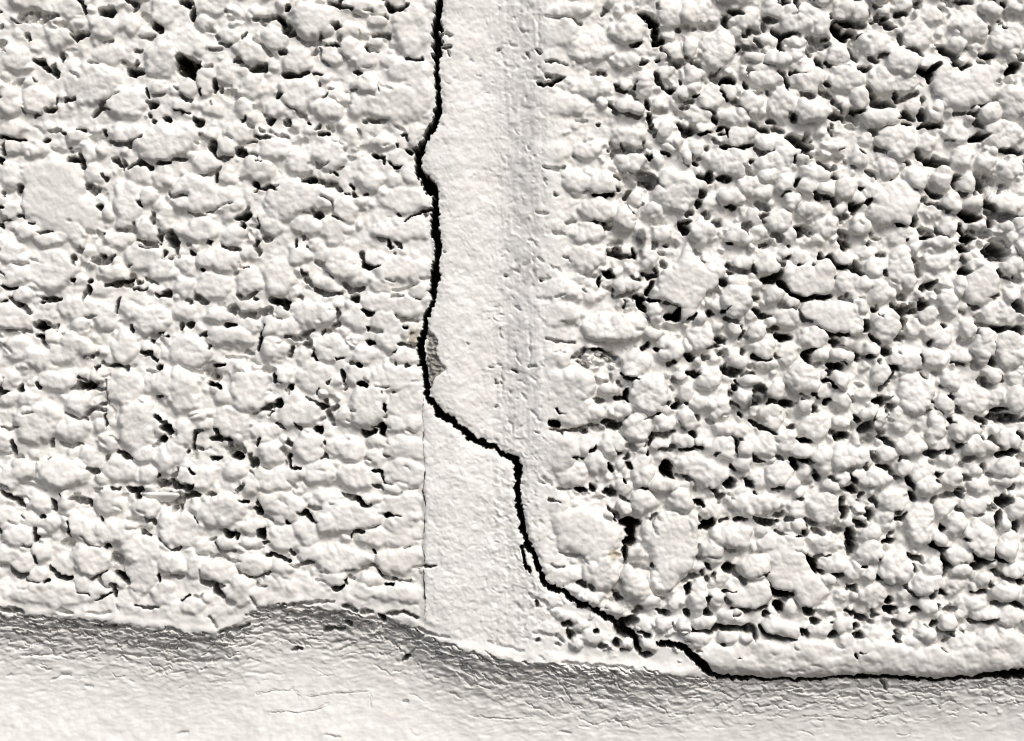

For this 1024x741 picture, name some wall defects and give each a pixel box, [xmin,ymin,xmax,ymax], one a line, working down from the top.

crack [412,0,1024,720]